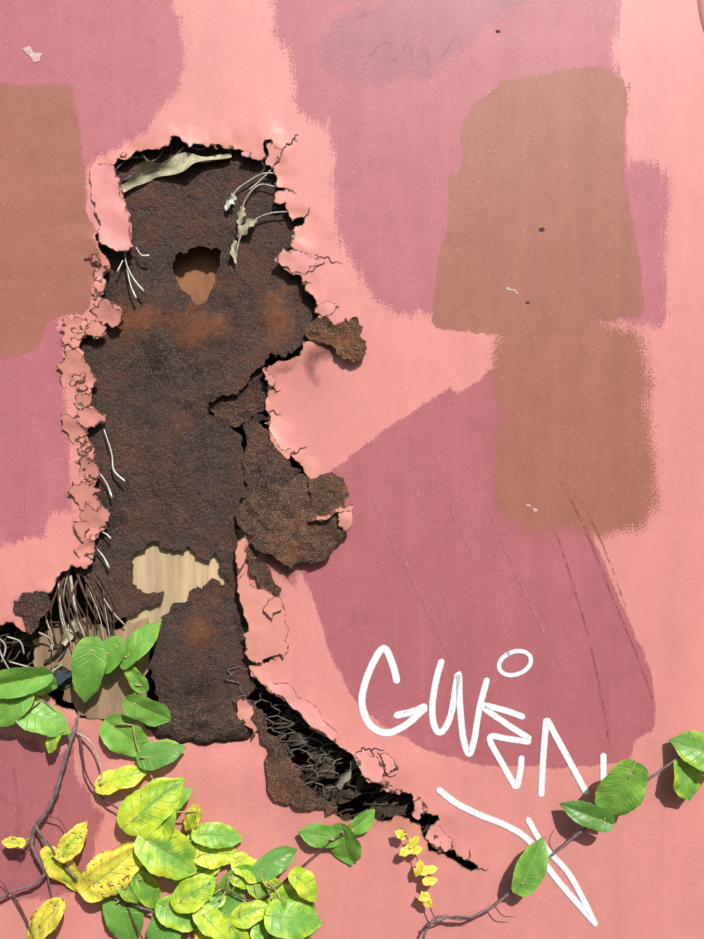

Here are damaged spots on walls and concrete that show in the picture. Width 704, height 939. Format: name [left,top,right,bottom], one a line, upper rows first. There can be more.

peeling [265,141,284,168]
peeling [274,234,318,285]
peeling [315,301,340,317]
peeling [56,152,134,560]
peeling [262,367,276,387]
peeling [268,431,296,459]
rust [71,137,367,815]
peeling [235,535,338,741]
crack [356,747,399,785]
peeling [354,749,403,795]
peeling [412,796,428,820]
peeling [425,824,454,855]